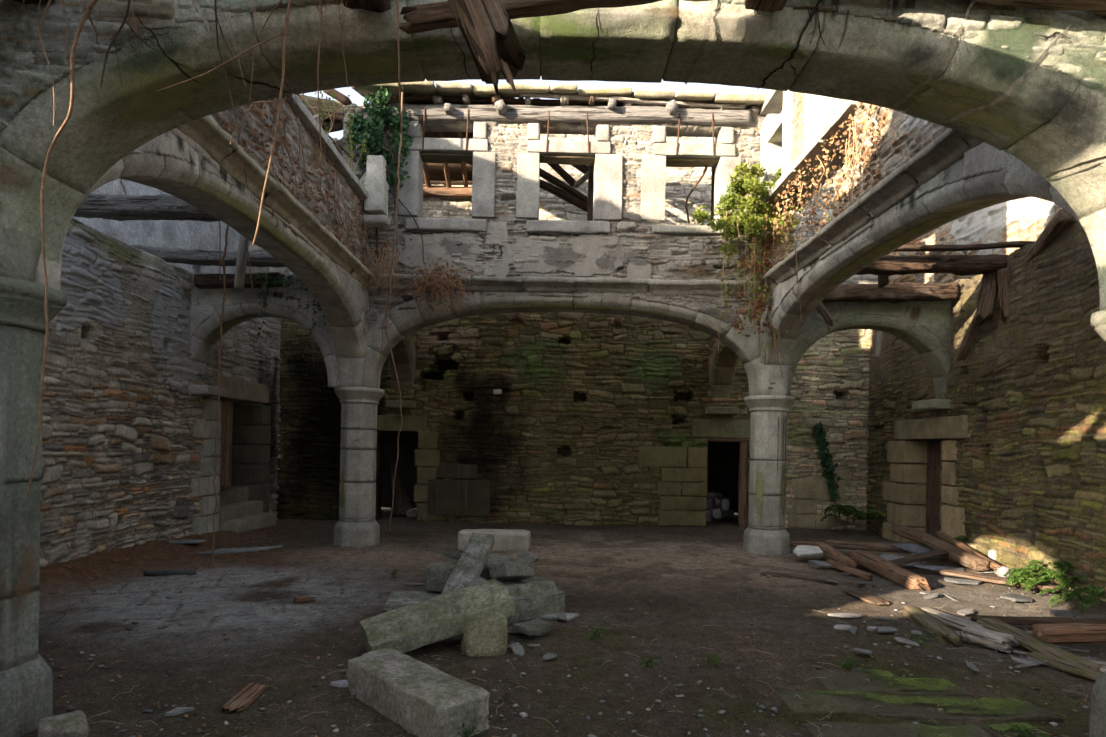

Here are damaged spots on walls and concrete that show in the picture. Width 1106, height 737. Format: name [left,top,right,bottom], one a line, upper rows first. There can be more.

crack [589,8,599,81]
crack [756,0,825,90]